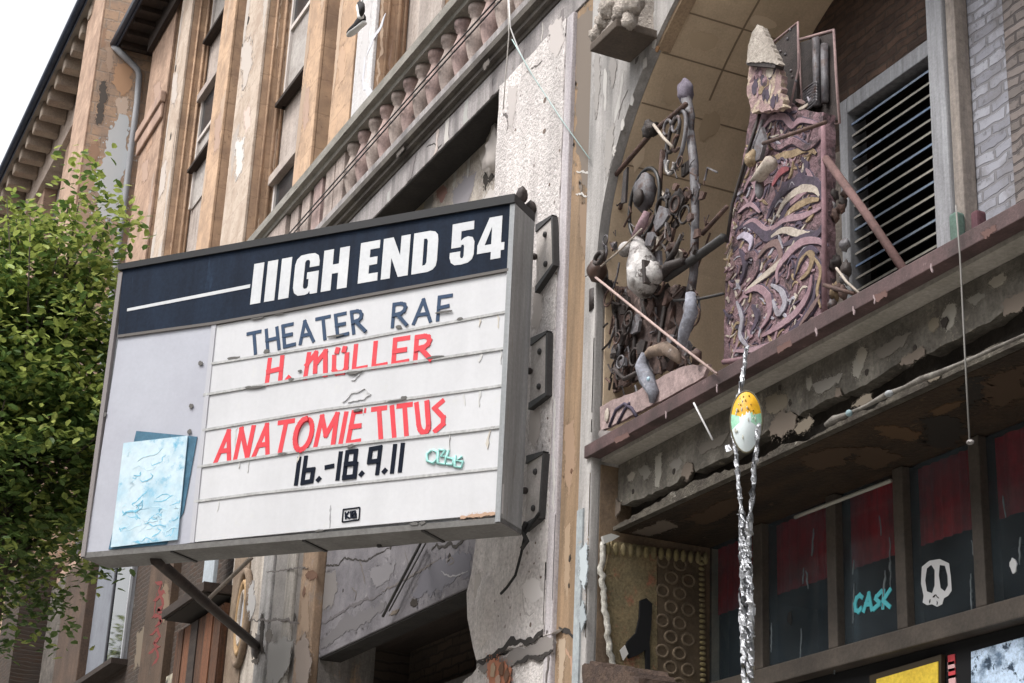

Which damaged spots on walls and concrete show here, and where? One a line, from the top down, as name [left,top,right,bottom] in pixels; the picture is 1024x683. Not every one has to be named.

peeling [88,27,153,223]
spalling [898,344,927,366]
spalling [762,385,814,443]
spalling [851,393,873,408]
spalling [672,461,694,482]
crack [251,548,388,625]
crack [431,540,467,578]
crack [477,562,573,683]